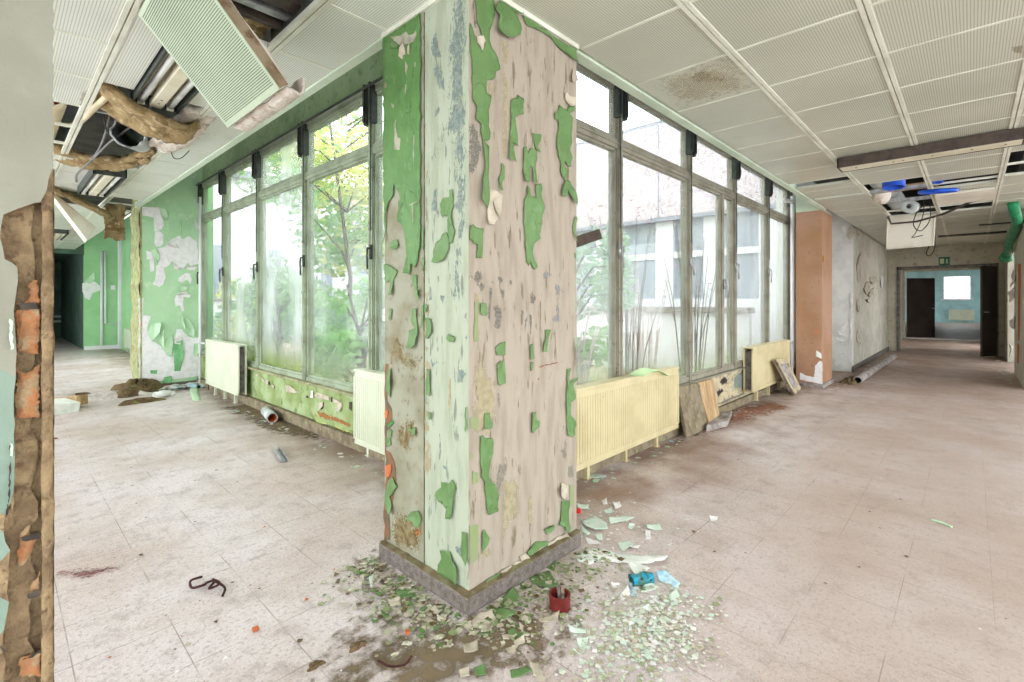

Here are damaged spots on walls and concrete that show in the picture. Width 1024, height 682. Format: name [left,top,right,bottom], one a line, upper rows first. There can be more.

flaking render [0,169,88,682]
peeling [129,199,202,384]
peeling [256,374,352,412]
peeling [437,524,491,586]
peeling [382,0,579,540]
peeling [486,368,578,582]
peeling [800,250,884,384]